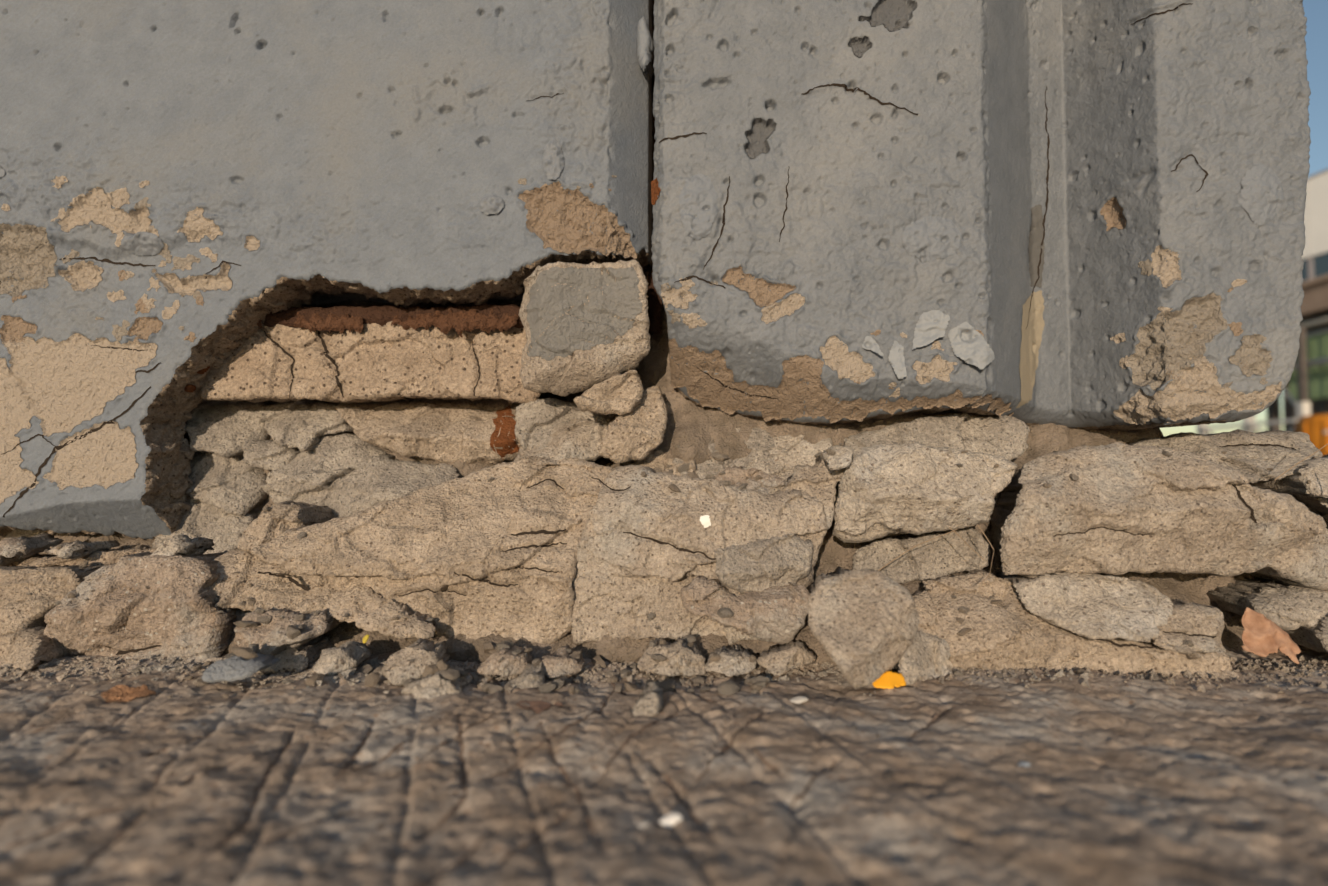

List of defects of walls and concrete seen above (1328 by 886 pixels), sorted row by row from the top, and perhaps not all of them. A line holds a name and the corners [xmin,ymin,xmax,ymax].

crack [802,83,918,115]
crack [1026,86,1050,328]
spalling [1100,197,1126,231]
peeling [722,265,805,324]
peeling [1138,245,1182,288]
crack [263,330,344,398]
spalling [0,175,653,566]
crack [472,344,481,396]
peeling [661,277,1040,433]
spalling [1075,279,1282,431]